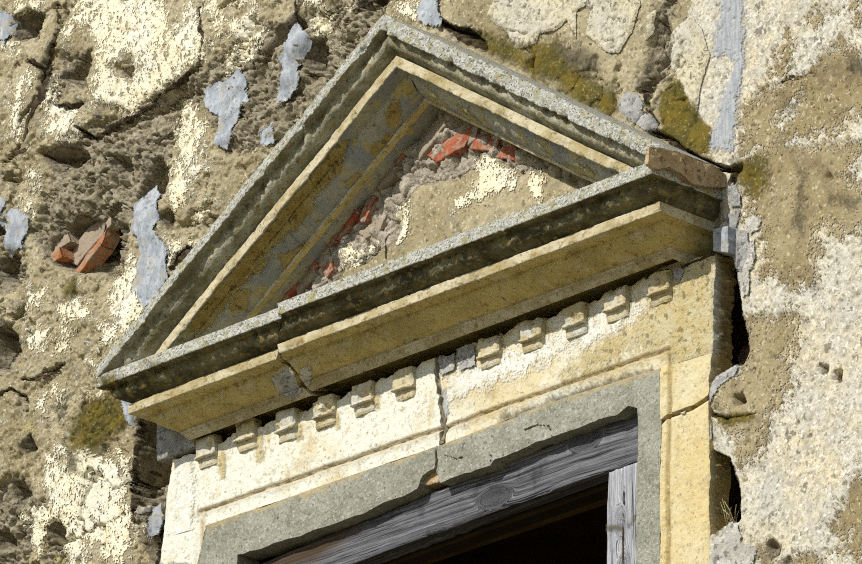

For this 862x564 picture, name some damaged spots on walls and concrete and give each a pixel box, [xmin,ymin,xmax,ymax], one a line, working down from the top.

flaking render [391,0,442,27]
flaking render [487,0,657,53]
peeling [0,0,355,406]
spalling [277,117,548,308]
peeling [28,379,69,420]
crack [434,357,463,470]